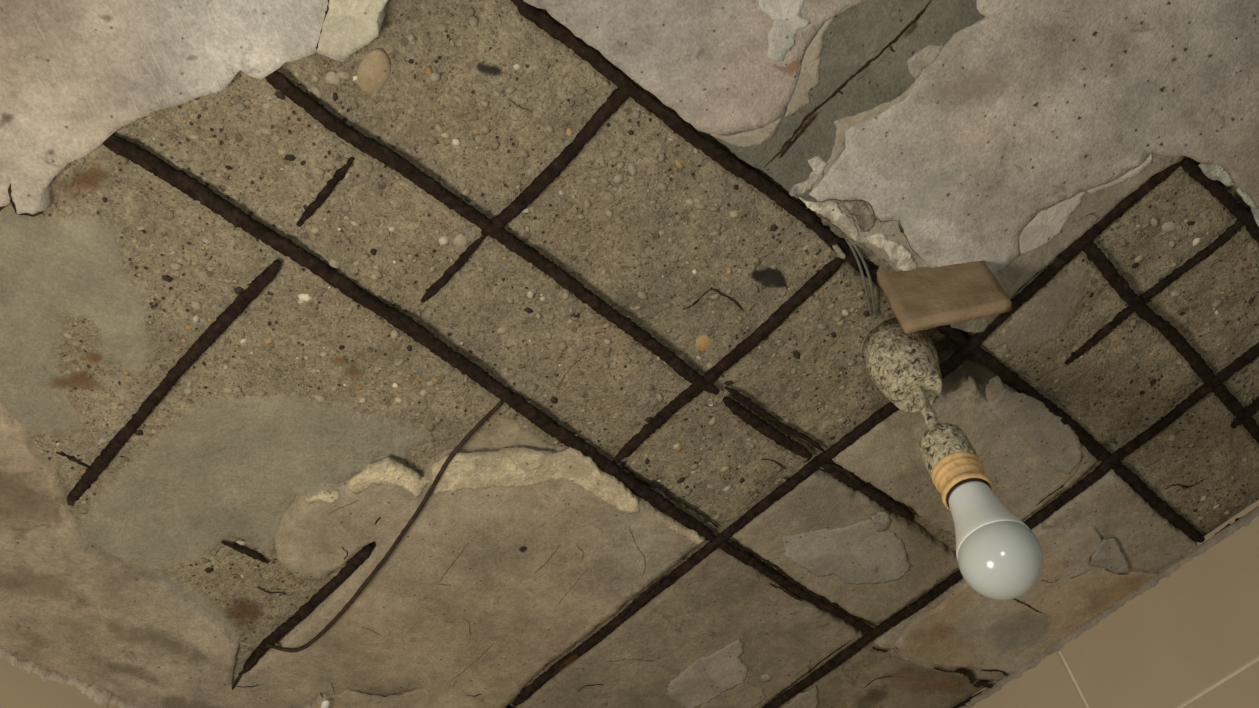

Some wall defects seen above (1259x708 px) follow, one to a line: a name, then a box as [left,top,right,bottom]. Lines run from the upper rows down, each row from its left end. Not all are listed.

crack [764,0,932,168]
crack [232,649,260,690]
spalling [0,144,640,684]
spalling [113,0,988,536]
spalling [508,409,1198,708]
spalling [932,250,1204,522]
spalling [995,152,1259,426]
spalling [1120,392,1259,537]